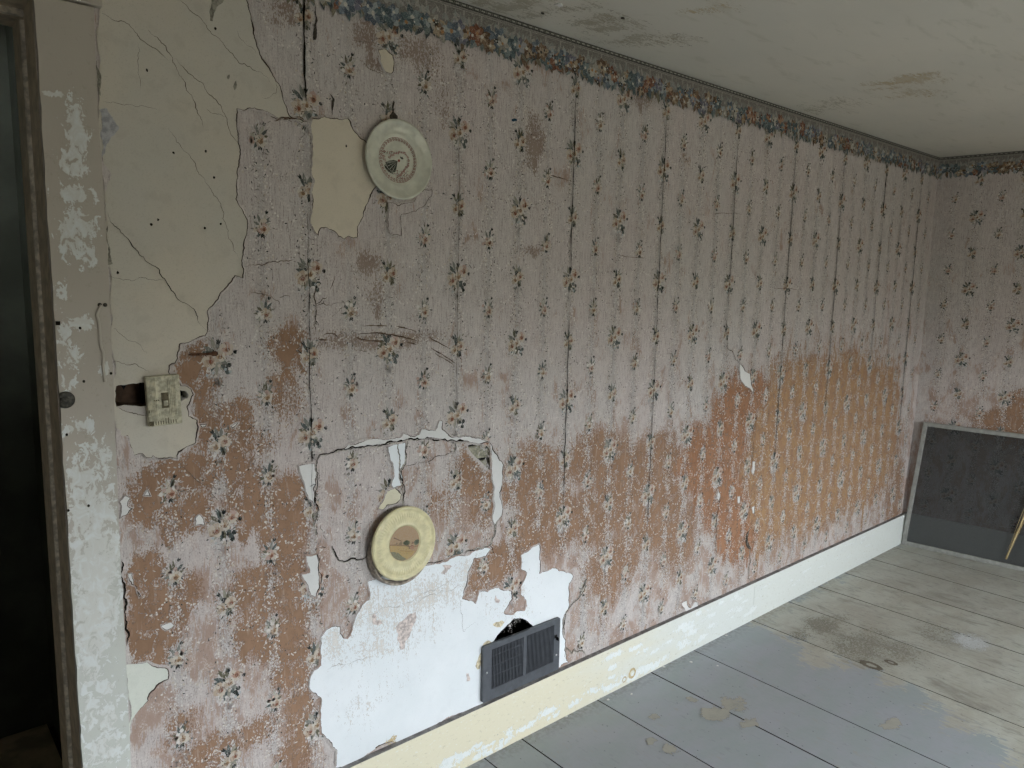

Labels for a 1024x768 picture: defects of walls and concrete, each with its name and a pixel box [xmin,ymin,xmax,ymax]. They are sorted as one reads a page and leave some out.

crack [102,13,235,139]
crack [180,0,306,122]
peeling [42,87,102,272]
crack [173,135,291,267]
peeling [52,278,94,392]
spalling [115,382,147,416]
crack [108,216,207,338]
leakage [120,242,446,768]
leakage [416,417,716,627]
leakage [714,325,913,579]
peeling [61,415,131,768]